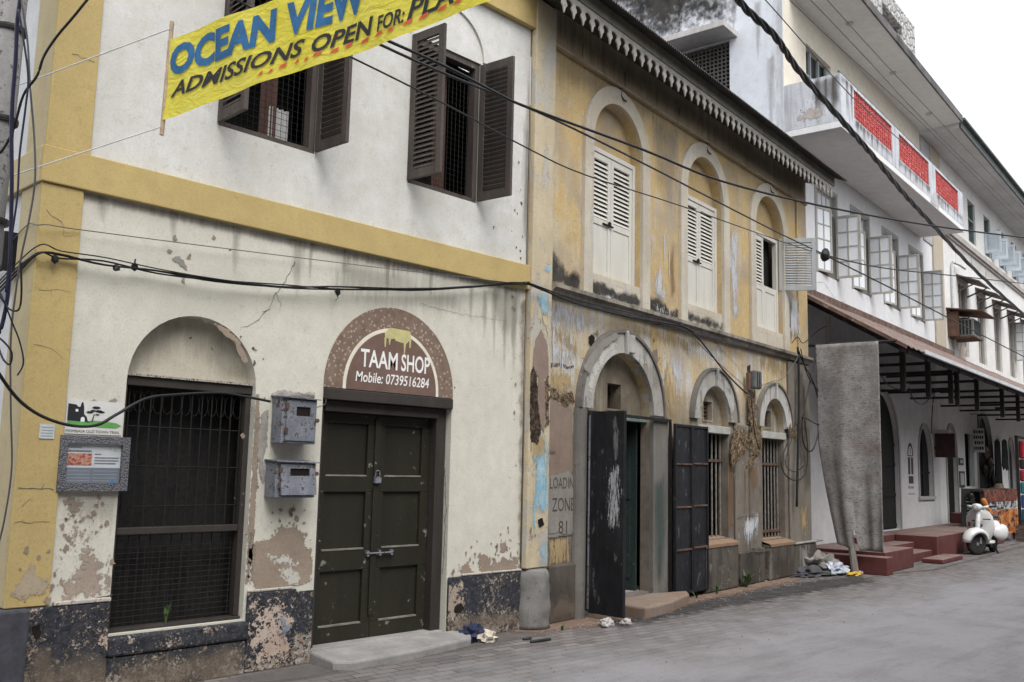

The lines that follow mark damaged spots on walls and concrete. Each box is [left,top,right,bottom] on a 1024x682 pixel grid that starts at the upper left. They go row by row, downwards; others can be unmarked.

water stain [614,0,726,36]
spalling [205,320,264,366]
crack [245,262,295,327]
water stain [552,253,749,423]
spalling [530,292,622,565]
peeling [10,495,116,605]
peeling [234,394,313,669]
peeling [448,527,520,628]
spalling [32,624,60,664]